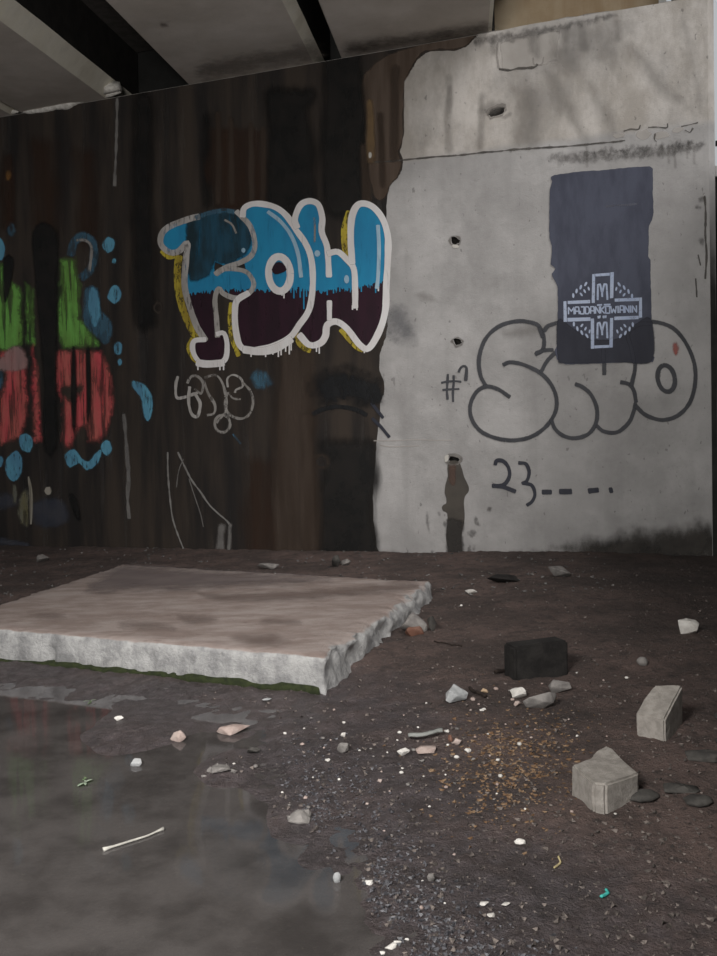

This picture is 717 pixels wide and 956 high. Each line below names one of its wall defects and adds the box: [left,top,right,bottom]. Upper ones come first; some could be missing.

peeling [499,32,559,71]
hole [487,103,506,119]
crack [374,122,698,163]
leakage [0,27,491,552]
leakage [566,259,717,556]